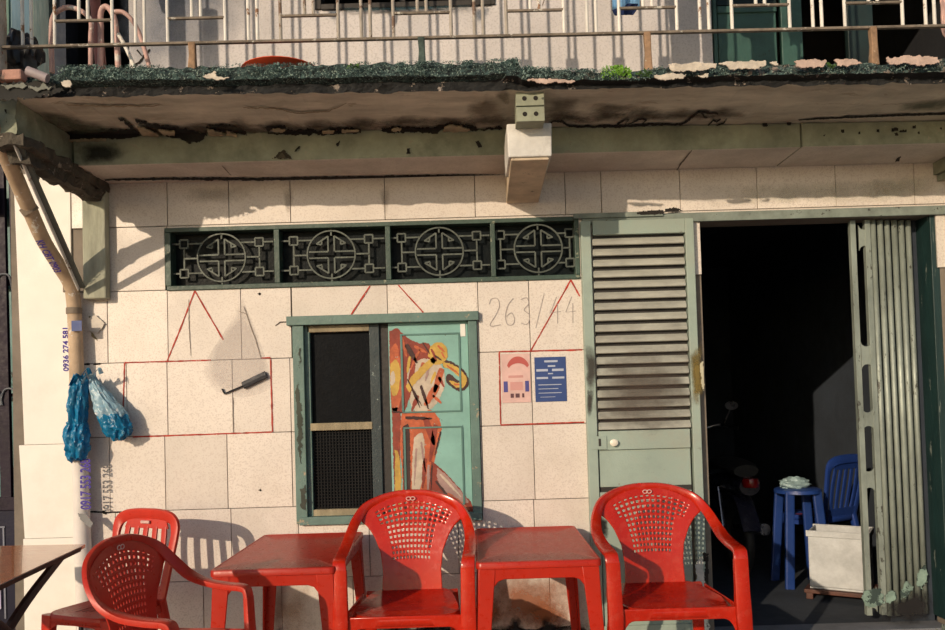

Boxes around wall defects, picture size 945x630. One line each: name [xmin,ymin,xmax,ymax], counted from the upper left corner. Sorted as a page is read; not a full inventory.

peeling [654,60,778,81]
peeling [794,58,862,69]
peeling [886,55,940,67]
water stain [221,103,346,132]
water stain [597,106,736,121]
spalling [66,118,246,144]
peeling [861,565,928,608]